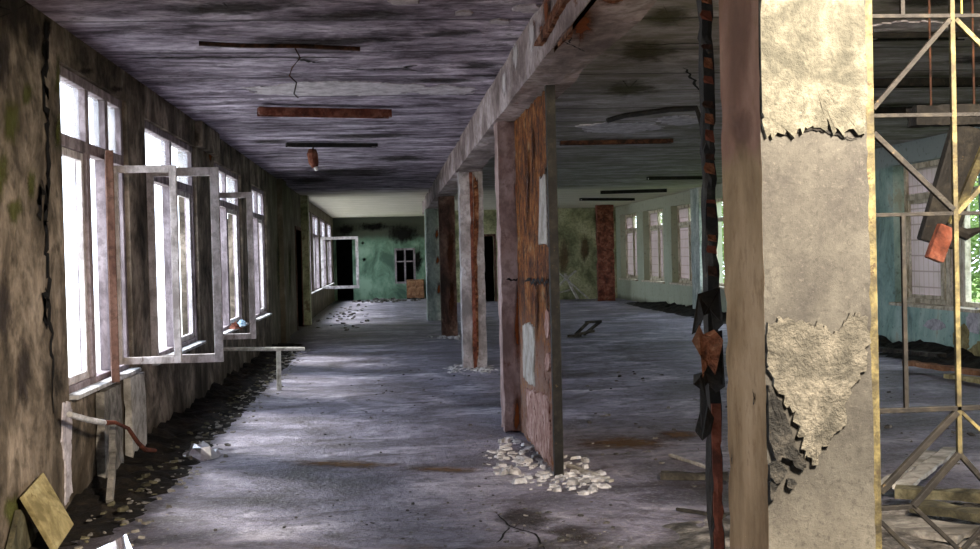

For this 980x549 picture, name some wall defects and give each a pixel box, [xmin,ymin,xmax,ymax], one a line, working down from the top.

crack [37,23,55,414]
peeling [538,168,548,247]
peeling [522,309,552,465]
spalling [766,312,871,500]